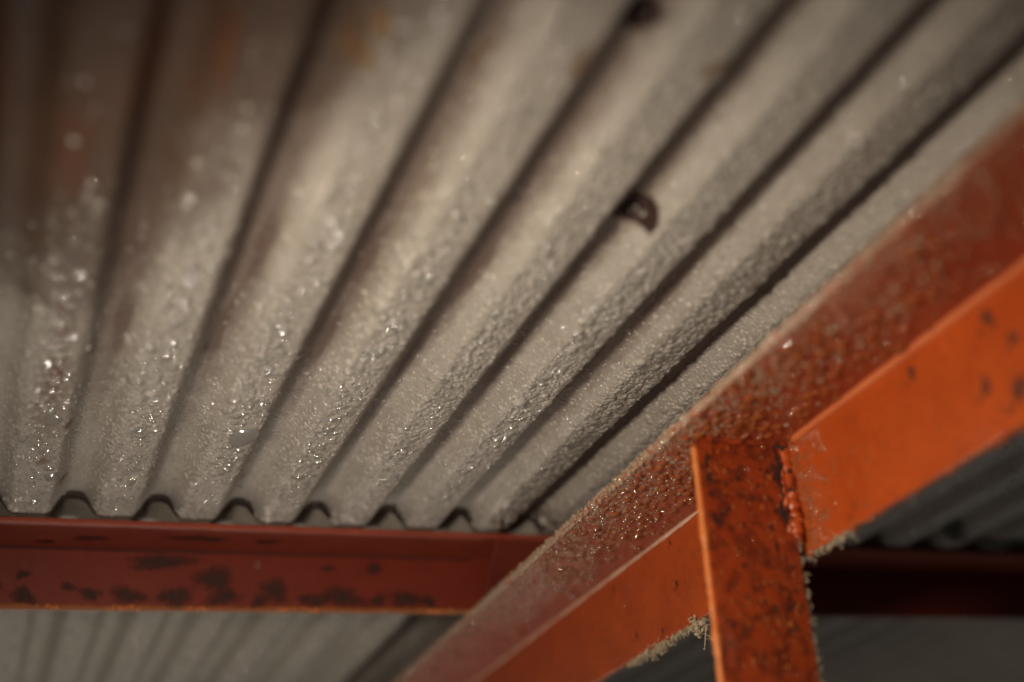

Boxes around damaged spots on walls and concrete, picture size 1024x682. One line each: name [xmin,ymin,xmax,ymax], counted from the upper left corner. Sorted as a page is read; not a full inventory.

rust [0,556,472,615]